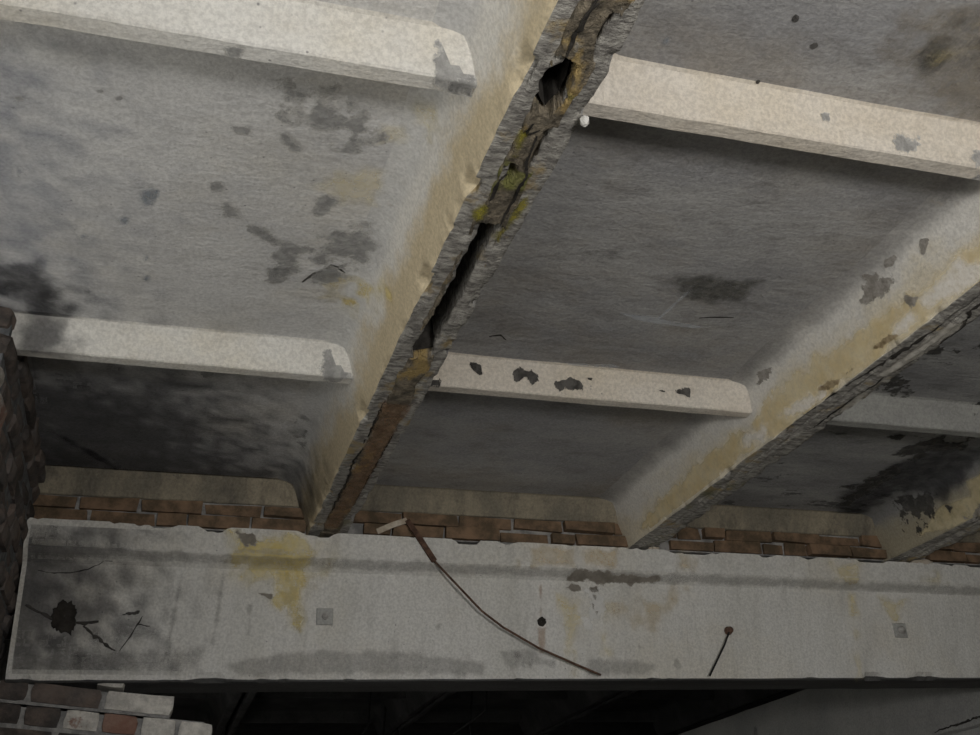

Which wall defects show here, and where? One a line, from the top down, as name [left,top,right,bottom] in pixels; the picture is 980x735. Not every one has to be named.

peeling [432,39,477,97]
spalling [538,57,570,105]
peeling [893,133,921,153]
spalling [859,255,897,305]
spalling [413,306,437,350]
peeling [512,366,539,385]
peeling [554,377,592,391]
leakage [643,250,980,535]
peeling [876,374,915,398]
peeling [840,434,976,506]
crack [75,617,150,651]
crack [935,716,980,733]